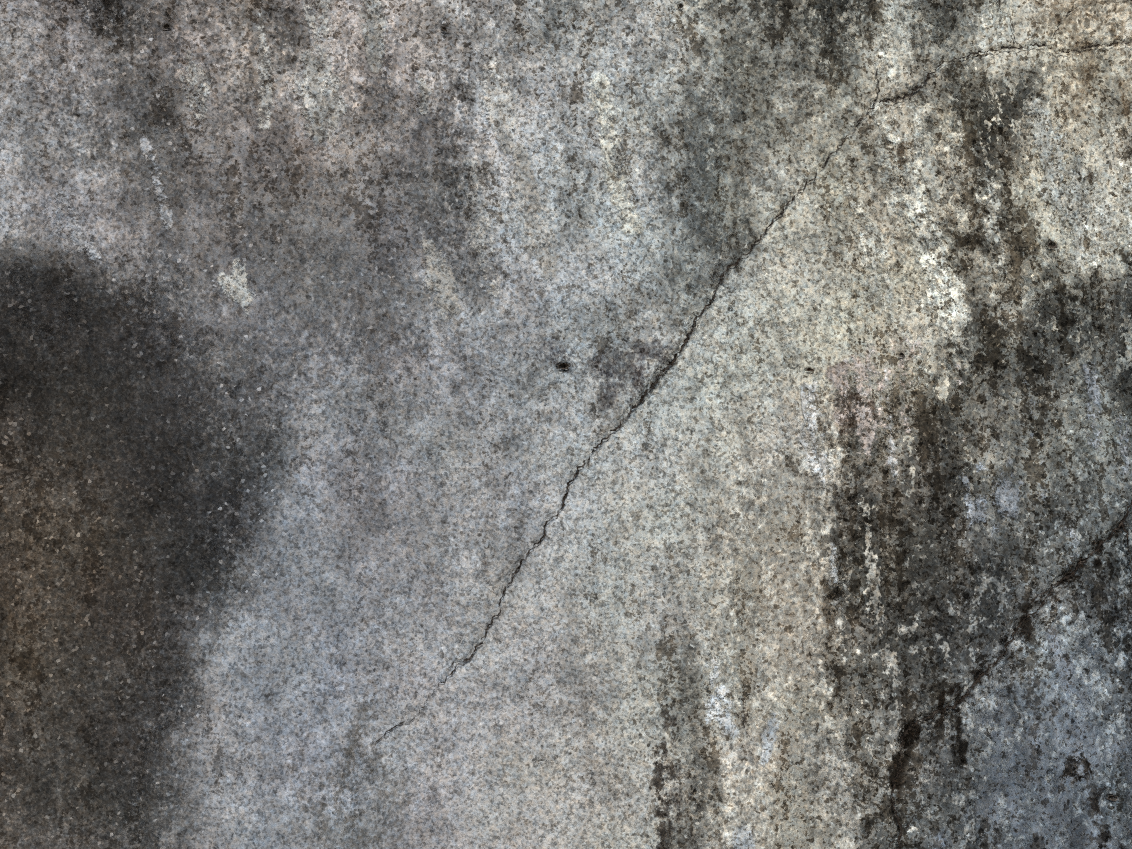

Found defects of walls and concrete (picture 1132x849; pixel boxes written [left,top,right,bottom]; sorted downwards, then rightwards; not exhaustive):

water stain [481,54,557,280]
water stain [589,73,643,234]
water stain [730,0,971,116]
water stain [1036,0,1132,118]
water stain [0,0,499,849]
water stain [594,343,671,408]
crack [375,0,1132,745]
water stain [641,43,1132,849]
crack [883,500,1132,849]